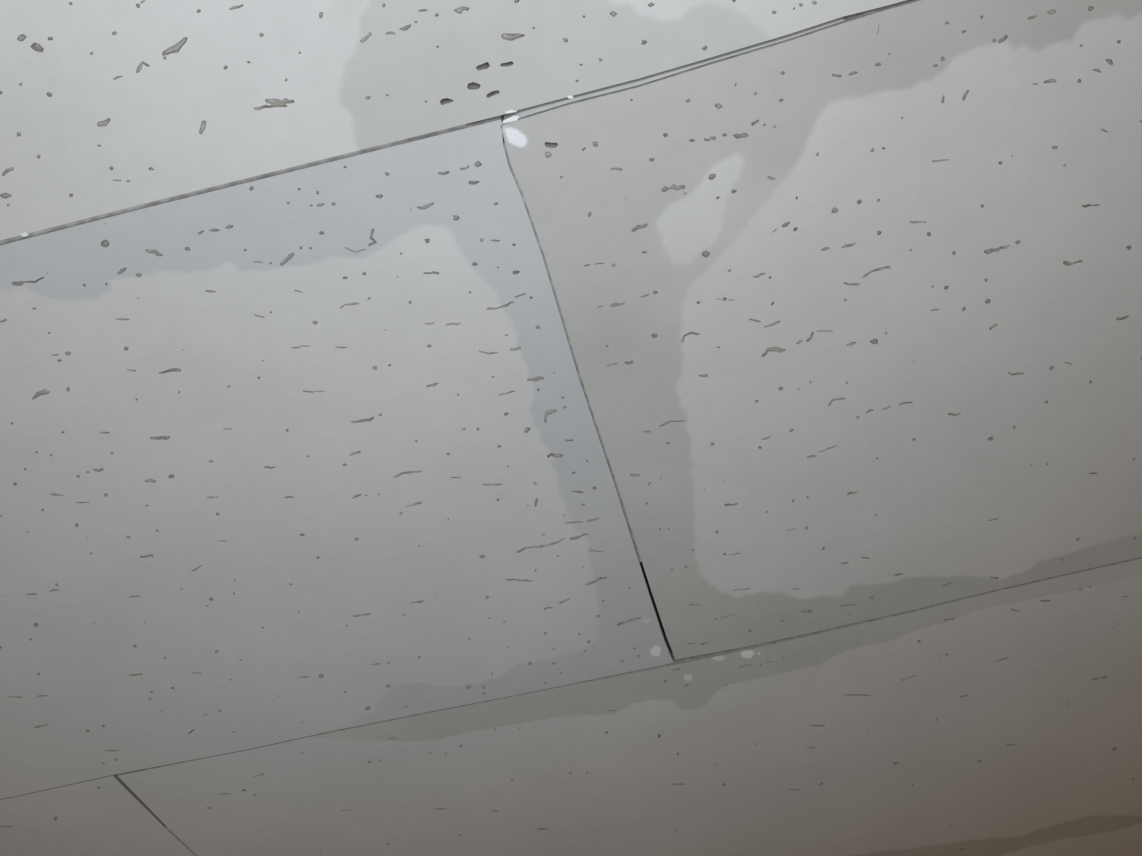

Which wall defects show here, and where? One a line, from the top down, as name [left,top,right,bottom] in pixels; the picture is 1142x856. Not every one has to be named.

water stain [324,0,778,151]
water stain [0,120,1142,743]
water stain [501,0,1142,659]